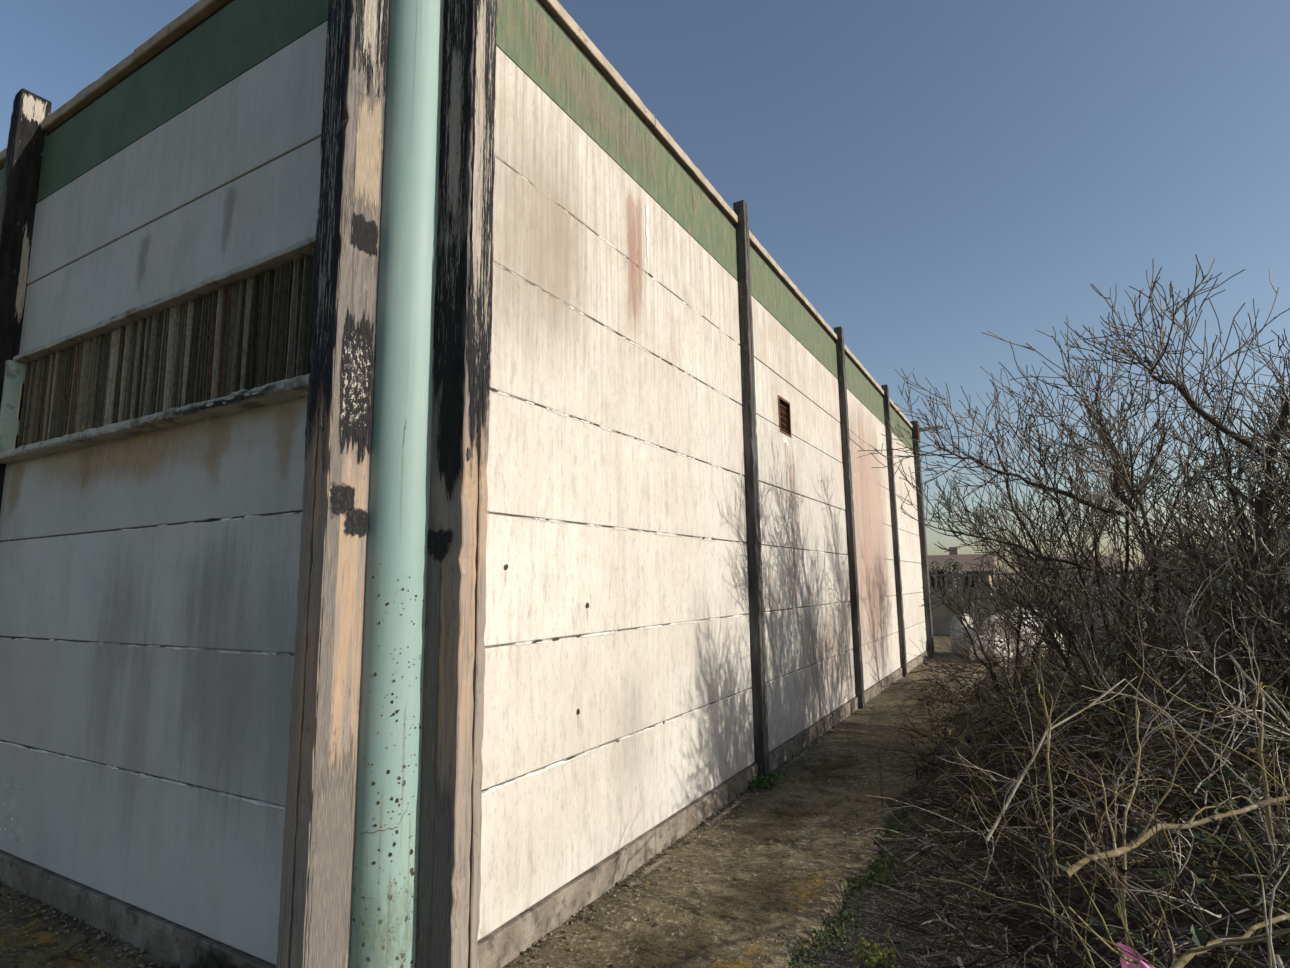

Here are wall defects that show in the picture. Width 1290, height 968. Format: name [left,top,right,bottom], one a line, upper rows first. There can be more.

corrosion [76,430,175,477]